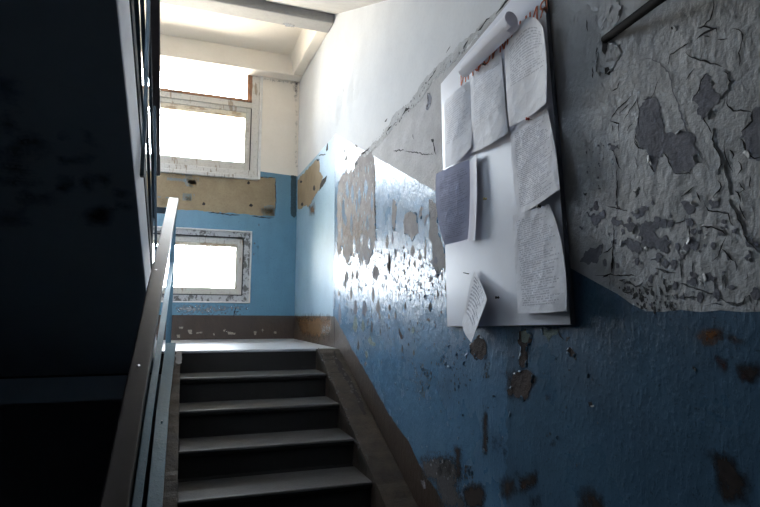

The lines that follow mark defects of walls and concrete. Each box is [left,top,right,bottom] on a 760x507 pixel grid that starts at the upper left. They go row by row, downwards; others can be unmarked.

flaking render [592,0,622,78]
crack [668,0,744,67]
peeling [634,82,699,174]
peeling [692,69,734,120]
peeling [739,107,760,161]
peeling [297,143,328,213]
peeling [337,0,508,418]
crack [608,171,627,211]
crack [671,118,760,262]
crack [596,228,634,278]
peeling [579,198,760,314]
peeling [506,326,576,402]